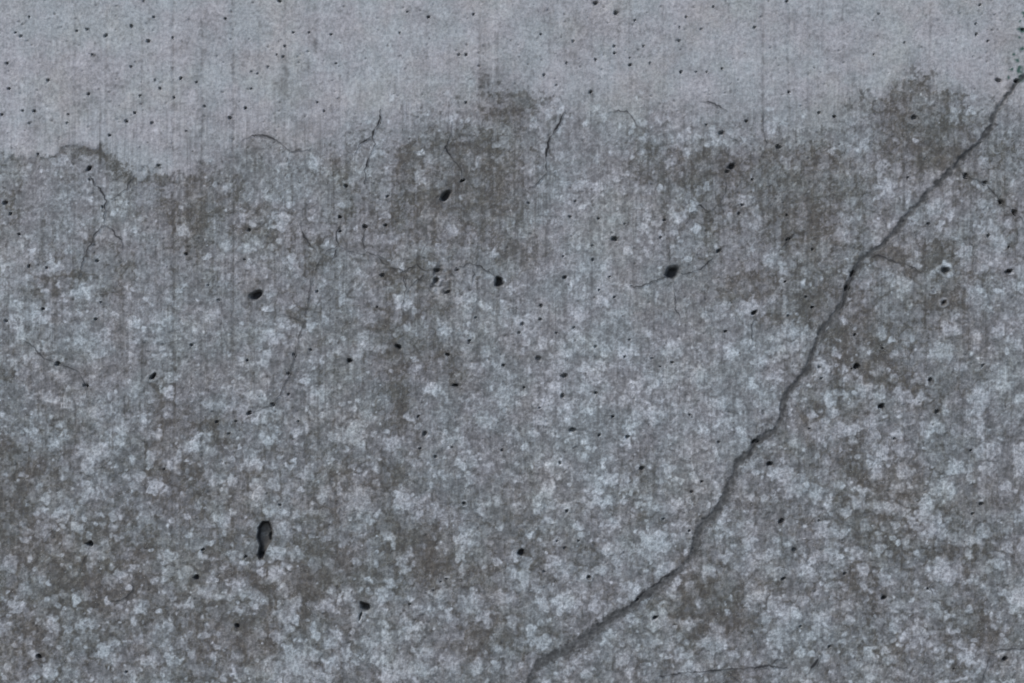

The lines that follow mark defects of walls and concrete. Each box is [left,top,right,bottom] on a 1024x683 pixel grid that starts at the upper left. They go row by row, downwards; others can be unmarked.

leakage [0,79,605,683]
crack [526,73,1024,683]
leakage [615,64,1024,574]
leakage [834,565,897,610]